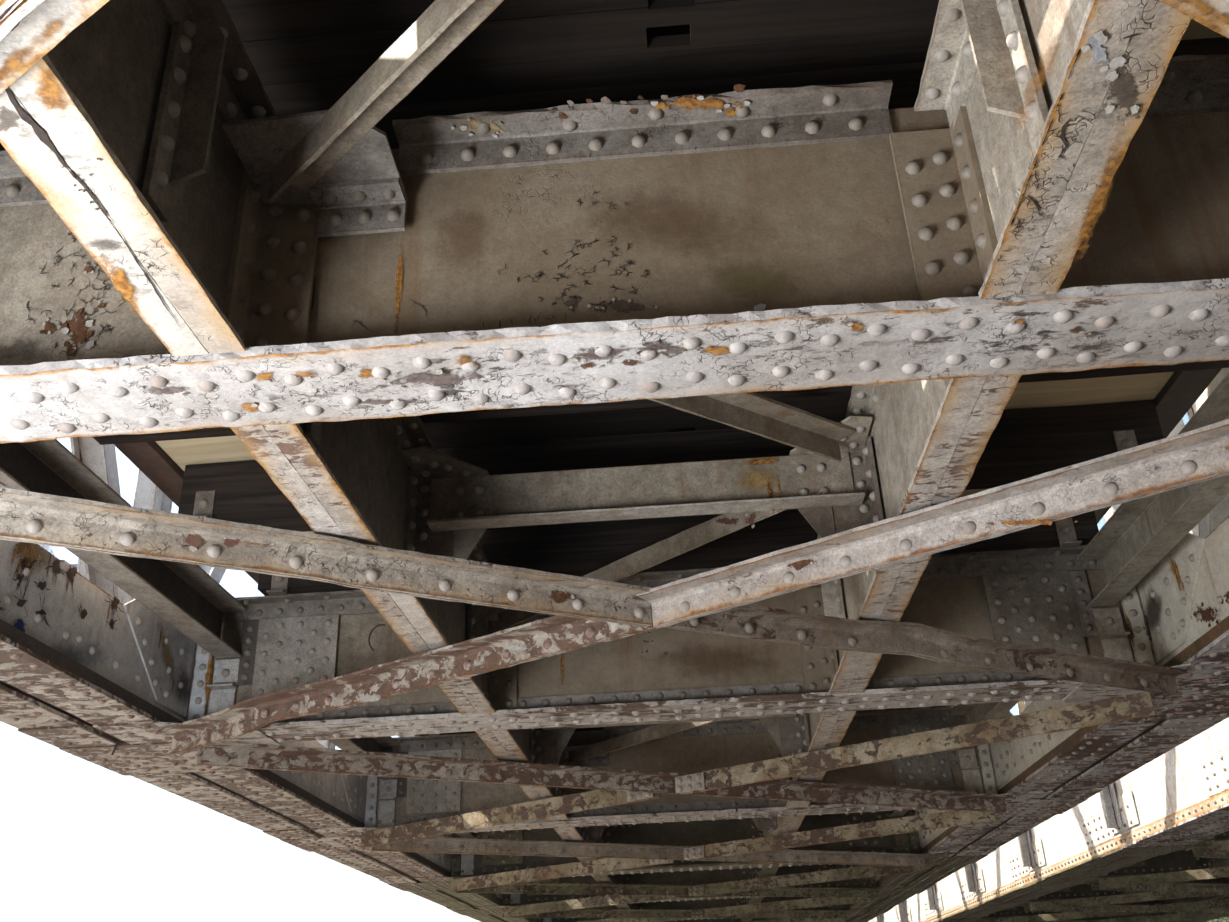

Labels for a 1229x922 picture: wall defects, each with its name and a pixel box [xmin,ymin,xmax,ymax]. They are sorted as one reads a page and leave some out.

corrosion [43,22,61,39]
corrosion [0,49,32,81]
corrosion [37,70,64,109]
corrosion [549,84,751,119]
crack [997,48,1081,261]
corrosion [1077,149,1116,250]
crack [25,227,180,359]
crack [443,191,648,379]
peeling [569,341,706,364]
peeling [361,369,487,407]
corrosion [1191,591,1229,627]
peeling [354,693,381,703]